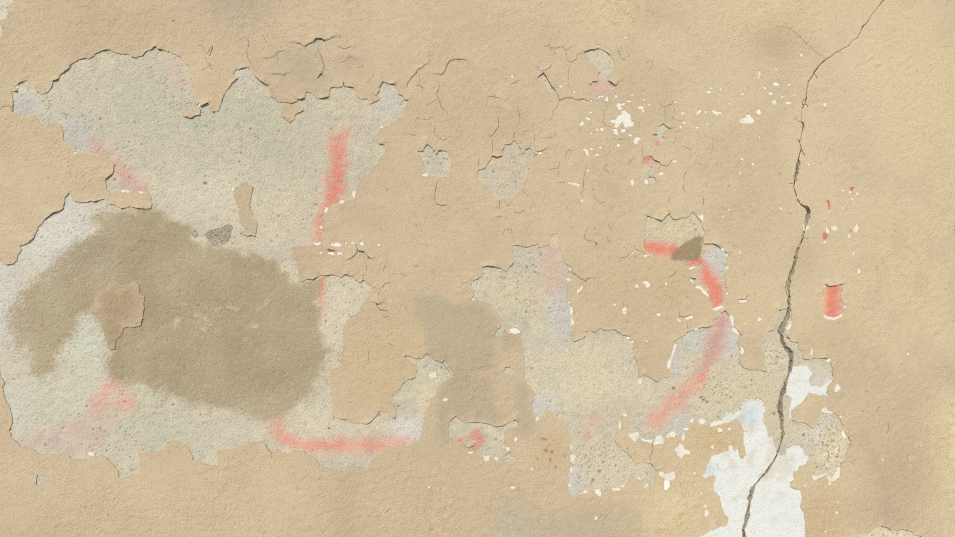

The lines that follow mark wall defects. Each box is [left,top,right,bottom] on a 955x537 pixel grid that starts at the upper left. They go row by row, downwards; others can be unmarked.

peeling [16,46,850,537]
crack [742,0,884,537]
peeling [859,526,921,537]